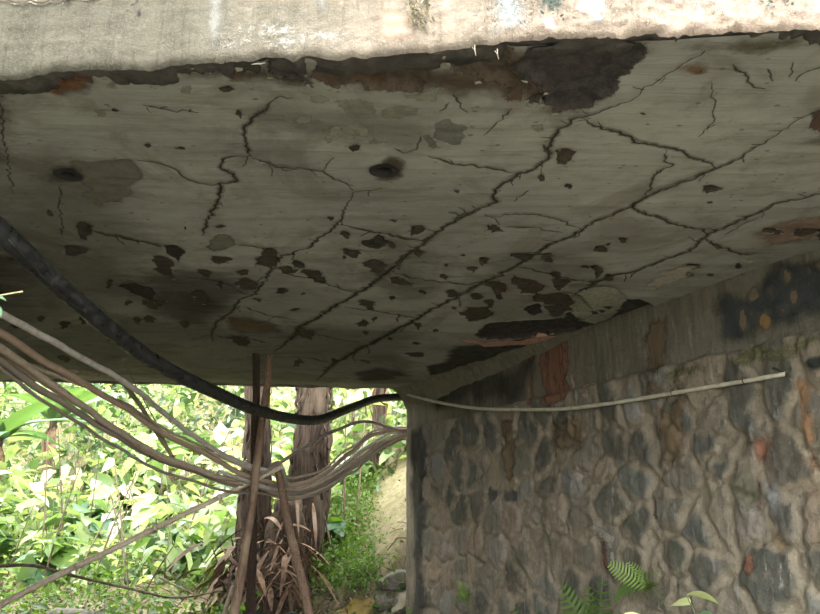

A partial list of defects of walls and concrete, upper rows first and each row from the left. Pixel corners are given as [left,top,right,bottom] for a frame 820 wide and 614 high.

spalling [511,42,648,115]
crack [0,103,14,194]
crack [91,230,178,247]
spalling [106,280,168,324]
spalling [152,246,185,280]
spalling [197,256,233,277]
spalling [255,248,327,284]
spalling [339,231,426,294]
crack [139,51,819,380]
spalling [451,254,652,341]
leakage [718,263,820,340]
rust [527,341,570,407]